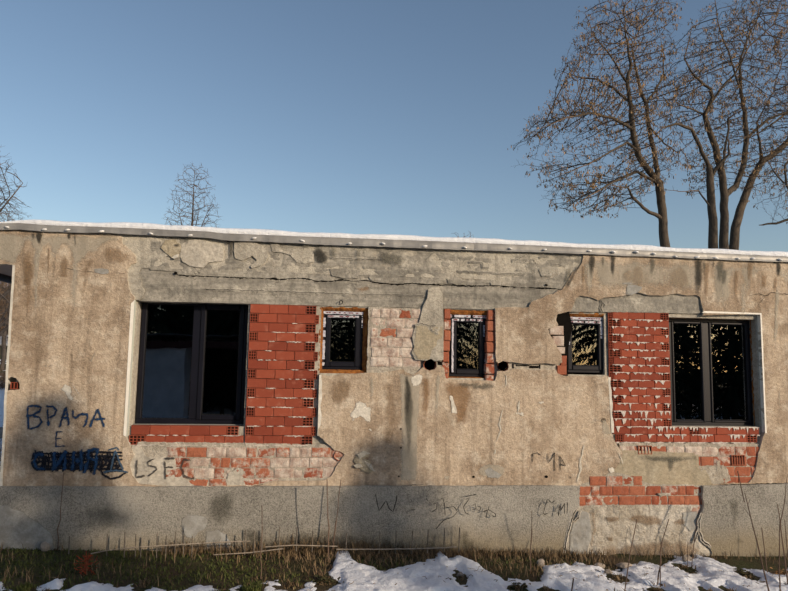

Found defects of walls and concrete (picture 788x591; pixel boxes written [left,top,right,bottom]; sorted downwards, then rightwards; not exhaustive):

spalling [150,237,583,376]
crack [175,253,566,297]
water stain [566,256,755,308]
spalling [130,441,344,486]
water stain [400,374,423,480]
spalling [566,442,760,556]